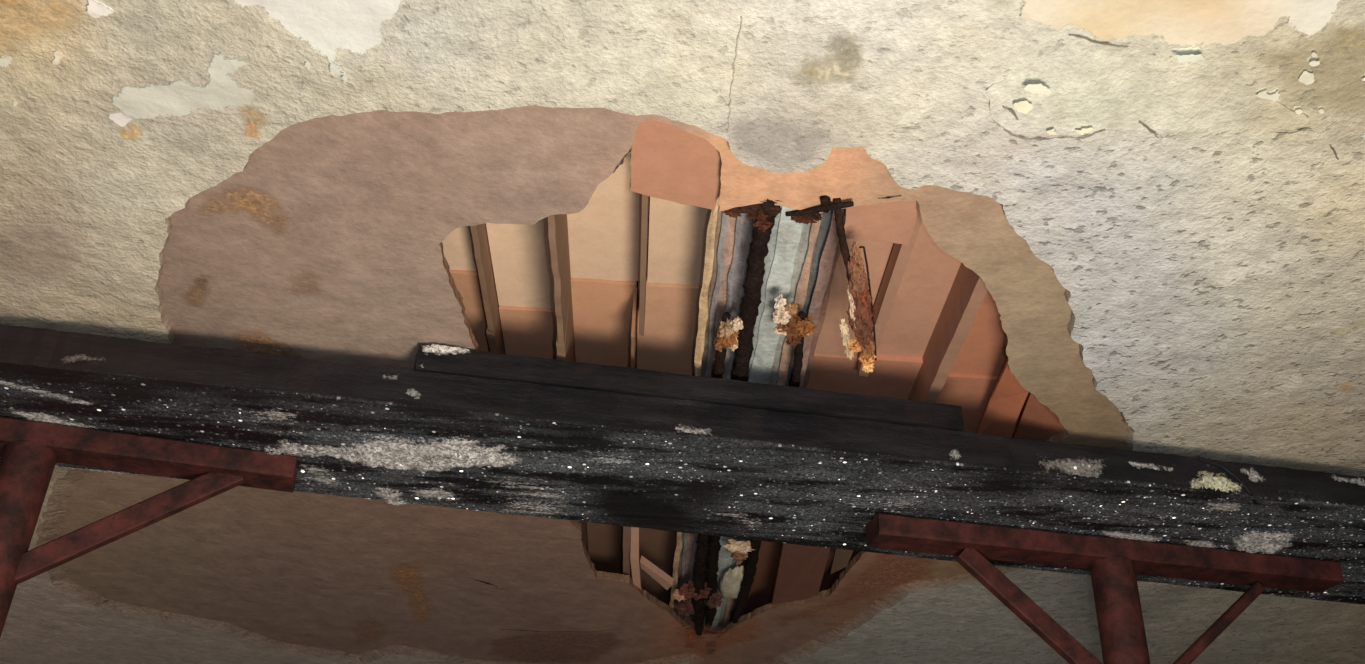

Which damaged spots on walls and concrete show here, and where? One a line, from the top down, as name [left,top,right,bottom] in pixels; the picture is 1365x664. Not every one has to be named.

peeling [87,0,115,18]
peeling [233,0,403,84]
peeling [1020,0,1340,85]
peeling [108,52,256,127]
peeling [1013,83,1051,114]
peeling [1256,87,1280,102]
rust [203,188,284,232]
rust [722,199,822,232]
flaking render [155,105,1134,450]
flaking render [35,467,189,548]
flaking render [47,486,979,664]